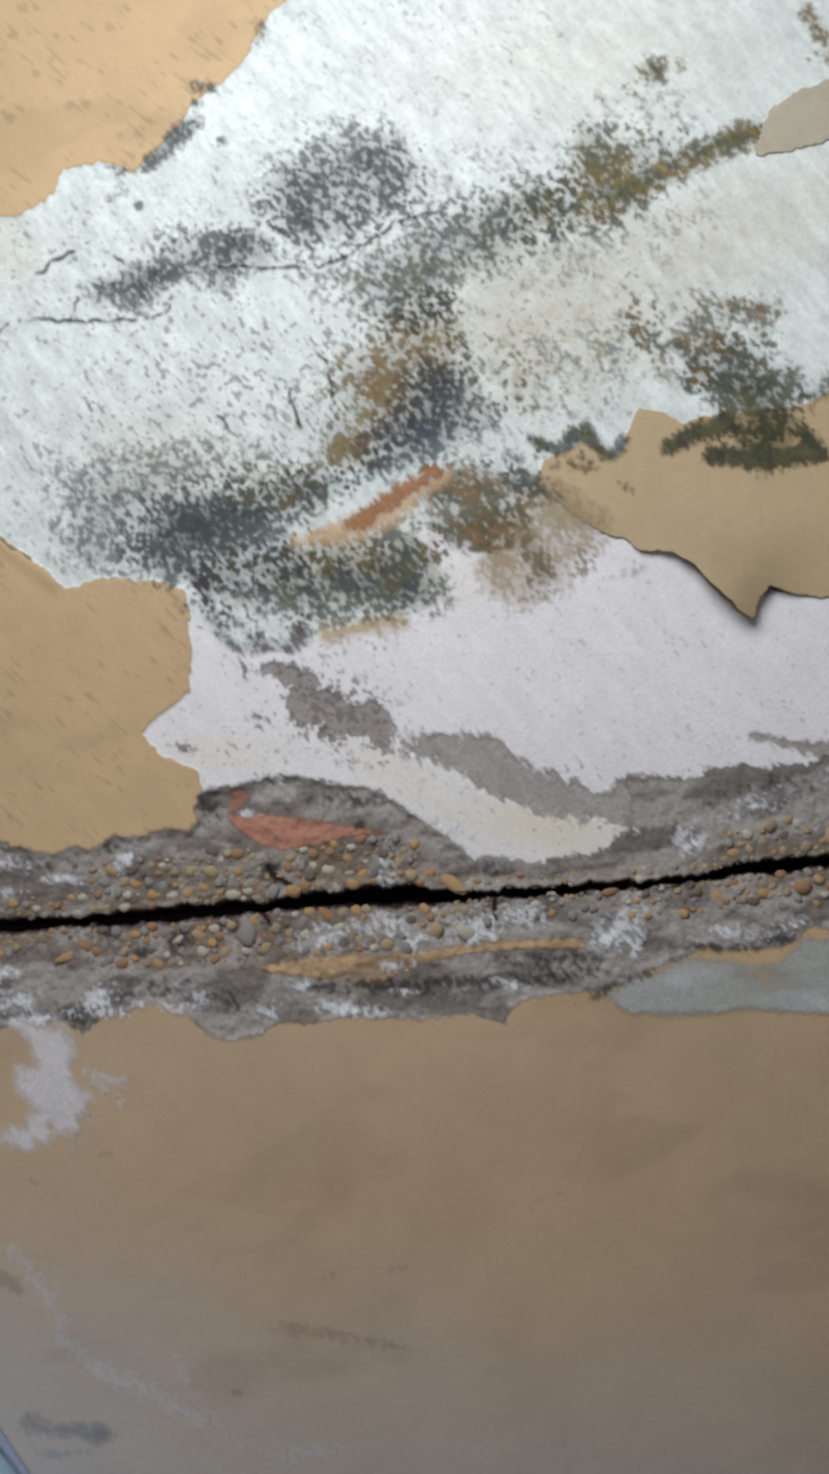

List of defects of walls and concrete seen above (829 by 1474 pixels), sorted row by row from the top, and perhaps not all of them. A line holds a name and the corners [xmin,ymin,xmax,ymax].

mould [113,83,216,173]
damp [70,120,763,653]
mould [657,297,829,469]
rust [294,464,451,544]
peeling [0,0,829,1041]
crack [0,854,829,936]
efflorescence [5,1016,88,1150]